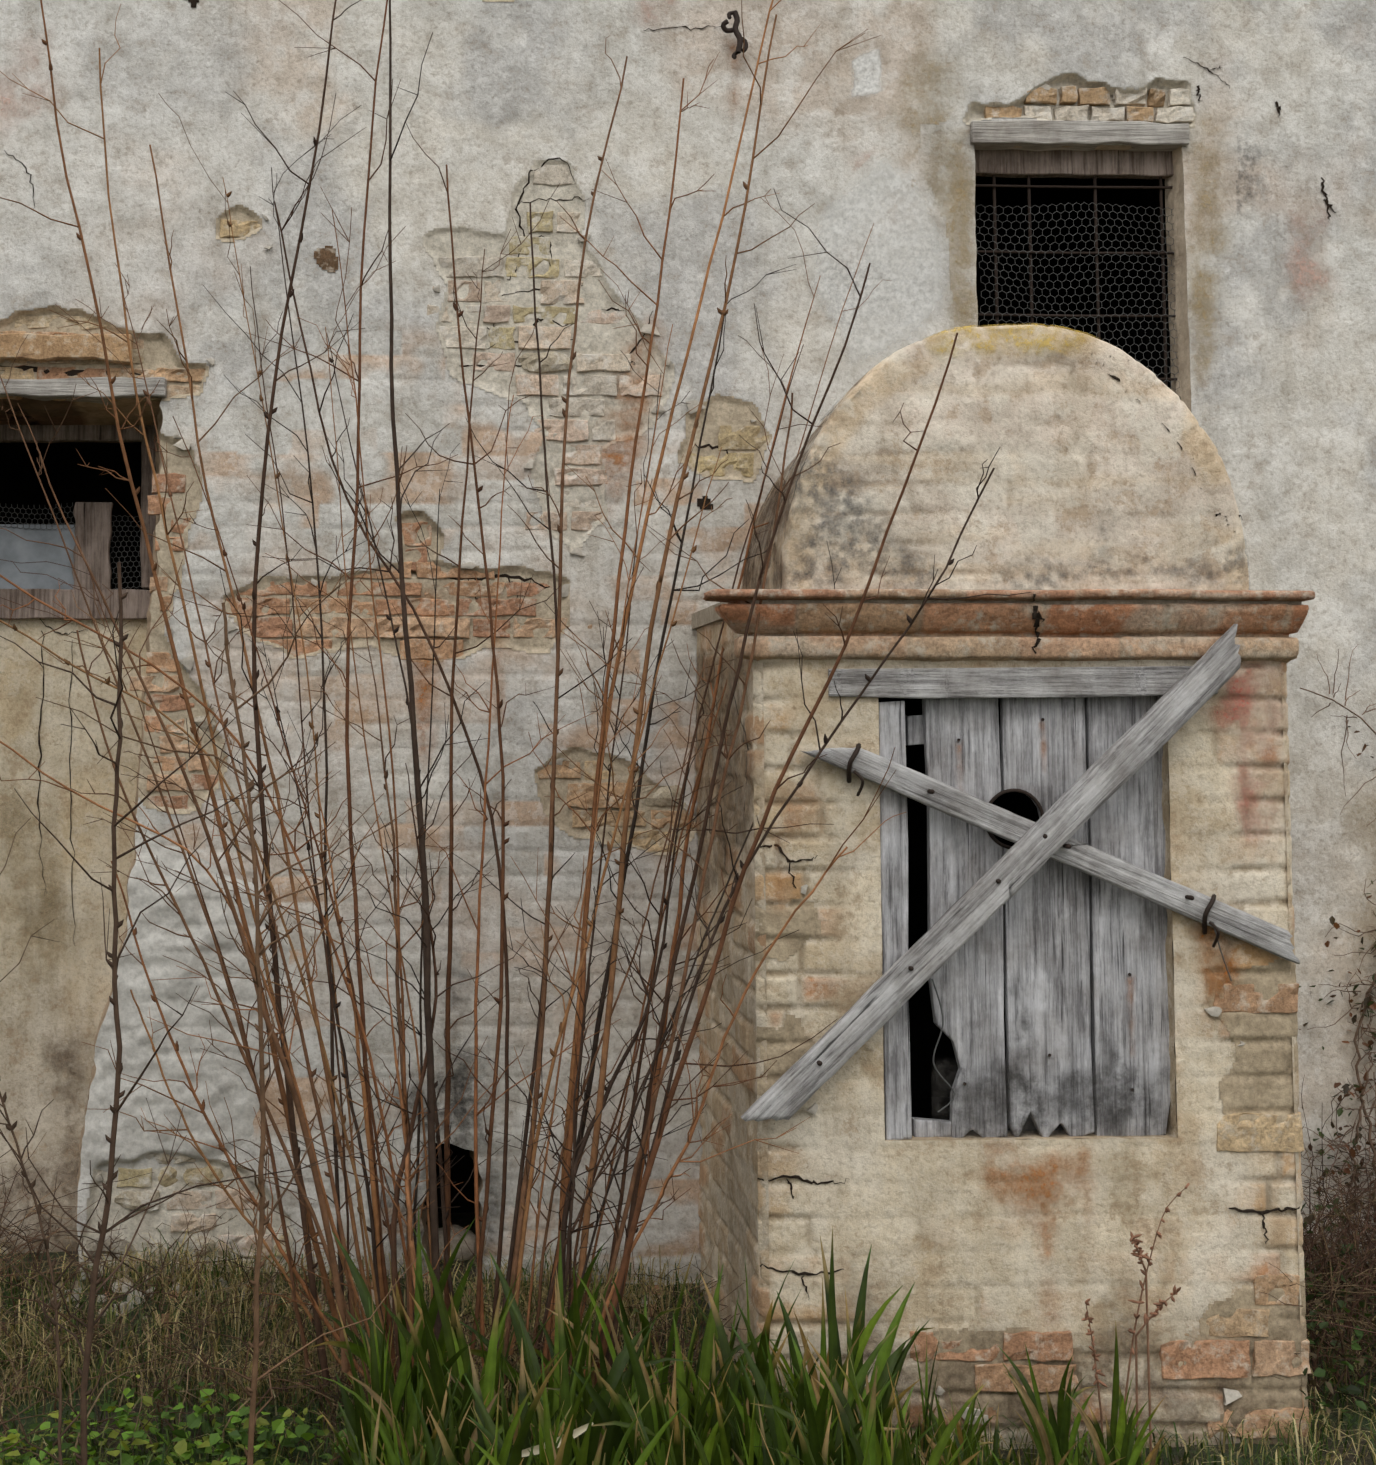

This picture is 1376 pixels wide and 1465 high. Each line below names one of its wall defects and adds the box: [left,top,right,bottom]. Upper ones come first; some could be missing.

crack [643,24,721,32]
flaking render [963,73,1197,127]
spalling [216,205,272,250]
flaking render [314,246,338,273]
spalling [0,305,215,402]
spalling [419,160,675,557]
spalling [678,393,772,509]
spalling [223,511,592,664]
crack [760,844,817,888]
crack [757,1175,848,1199]
crack [1229,1206,1300,1244]
crack [760,1264,844,1300]